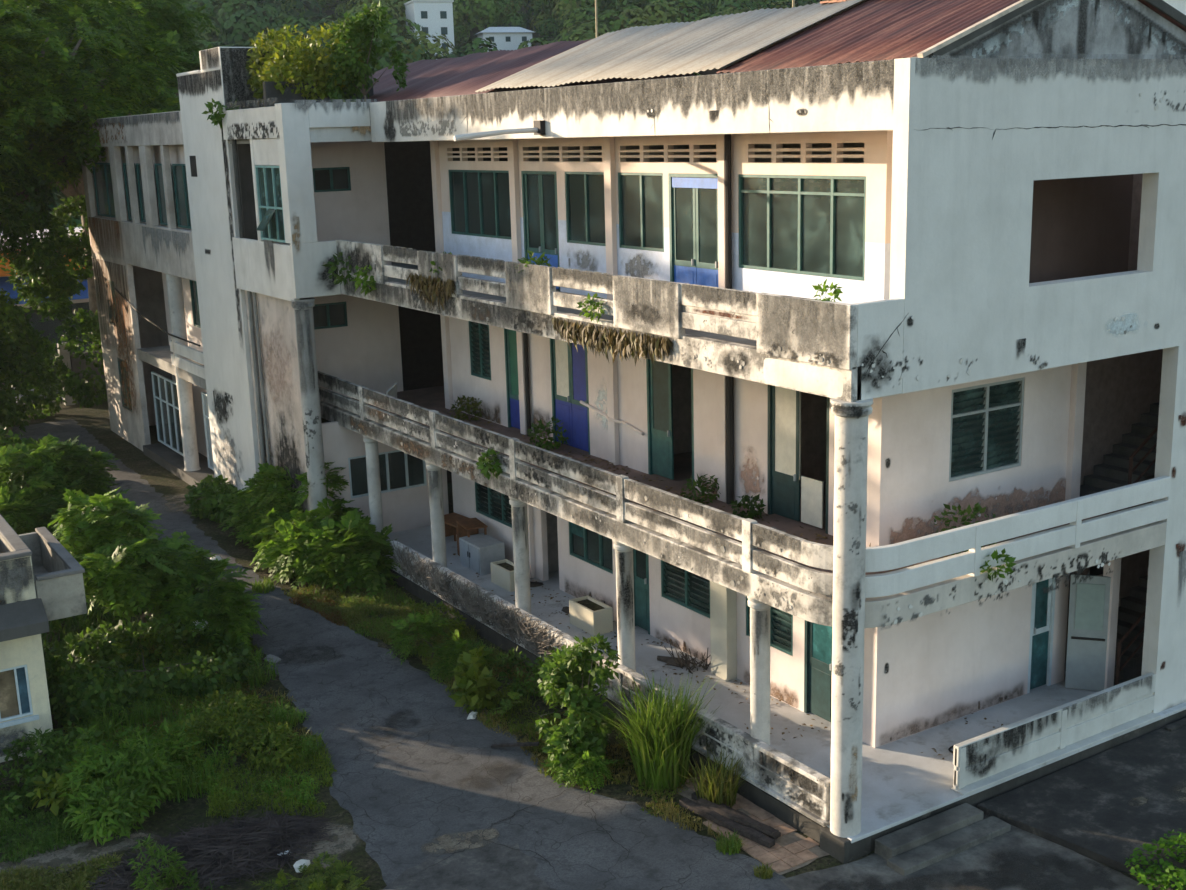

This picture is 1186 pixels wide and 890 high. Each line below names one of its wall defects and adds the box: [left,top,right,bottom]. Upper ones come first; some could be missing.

water stain [295,59,894,141]
crack [914,124,1186,139]
water stain [318,245,846,358]
spalling [860,344,923,388]
water stain [213,391,241,485]
water stain [258,417,307,506]
water stain [292,301,800,631]
peeling [890,480,1066,544]
spalling [975,549,1117,605]
spalling [835,583,861,676]
water stain [966,675,1152,776]
spalling [842,793,853,823]